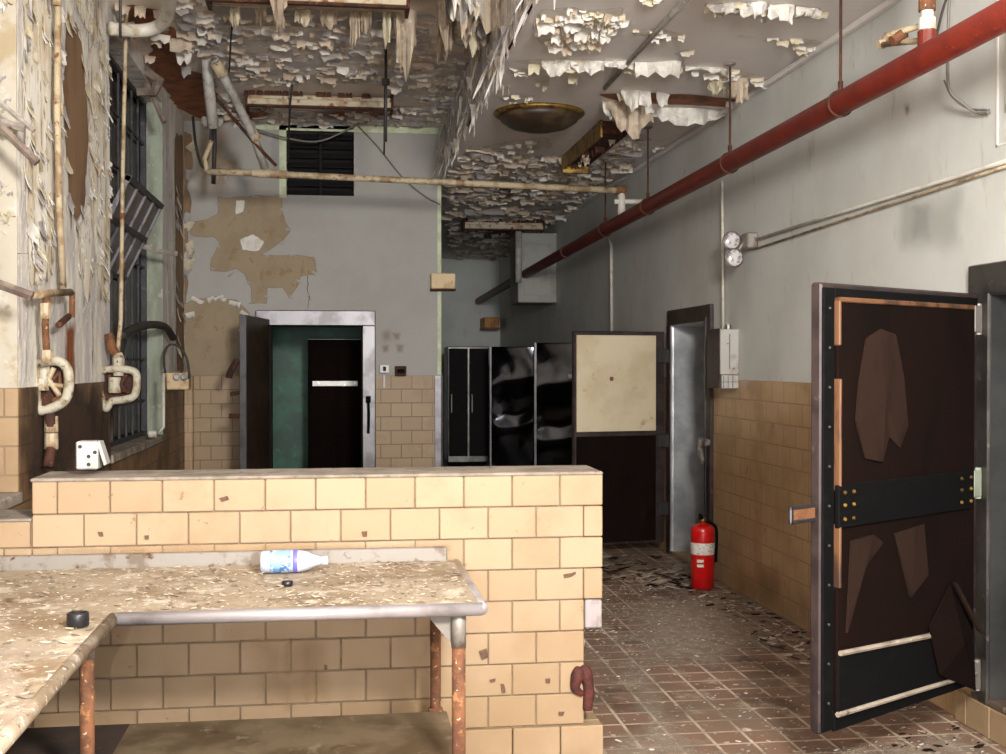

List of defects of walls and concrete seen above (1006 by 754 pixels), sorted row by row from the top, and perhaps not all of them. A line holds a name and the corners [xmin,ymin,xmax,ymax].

peeling [0,0,113,306]
flaking render [175,132,317,376]
peeling [144,0,768,261]
peeling [703,1,829,25]
peeling [764,38,823,57]